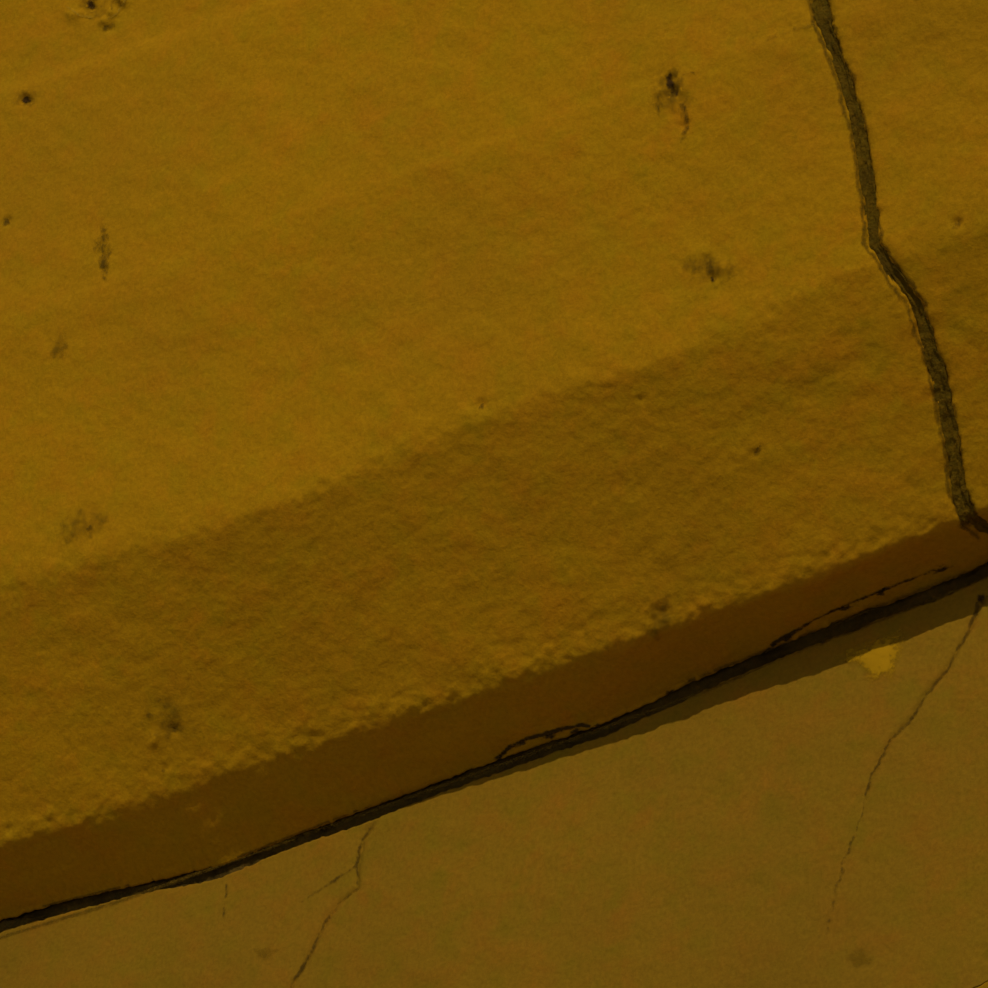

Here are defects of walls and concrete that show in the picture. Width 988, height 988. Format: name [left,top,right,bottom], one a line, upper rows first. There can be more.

crack [810,0,988,538]
crack [0,562,988,939]
crack [294,921,326,979]